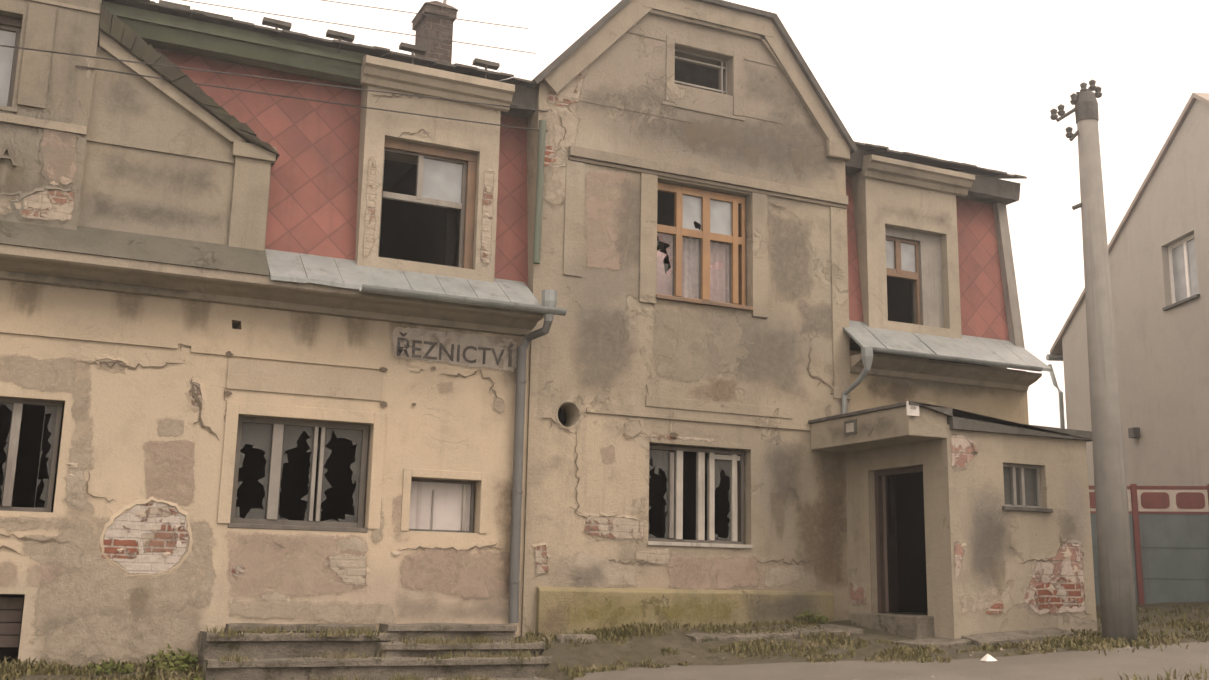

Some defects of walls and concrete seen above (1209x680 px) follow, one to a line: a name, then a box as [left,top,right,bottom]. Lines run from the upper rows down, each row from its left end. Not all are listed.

spalling [0,121,82,225]
spalling [541,54,601,211]
peeling [0,353,130,474]
crack [76,343,227,440]
crack [410,369,497,398]
crack [541,383,651,525]
spalling [951,430,979,472]
crack [0,533,71,556]
peeling [0,377,216,643]
peeling [229,496,402,624]
peeling [531,512,670,588]
spalling [1022,538,1088,617]